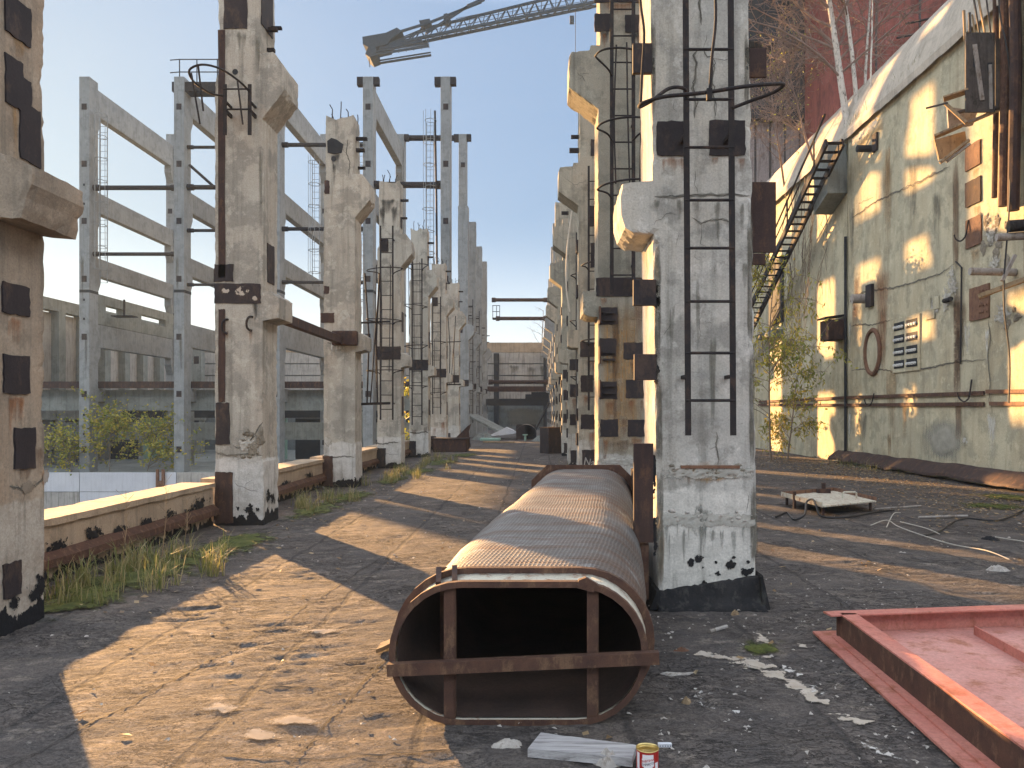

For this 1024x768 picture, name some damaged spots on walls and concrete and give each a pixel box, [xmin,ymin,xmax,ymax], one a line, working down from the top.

crack [654,172,749,253]
spalling [238,426,265,459]